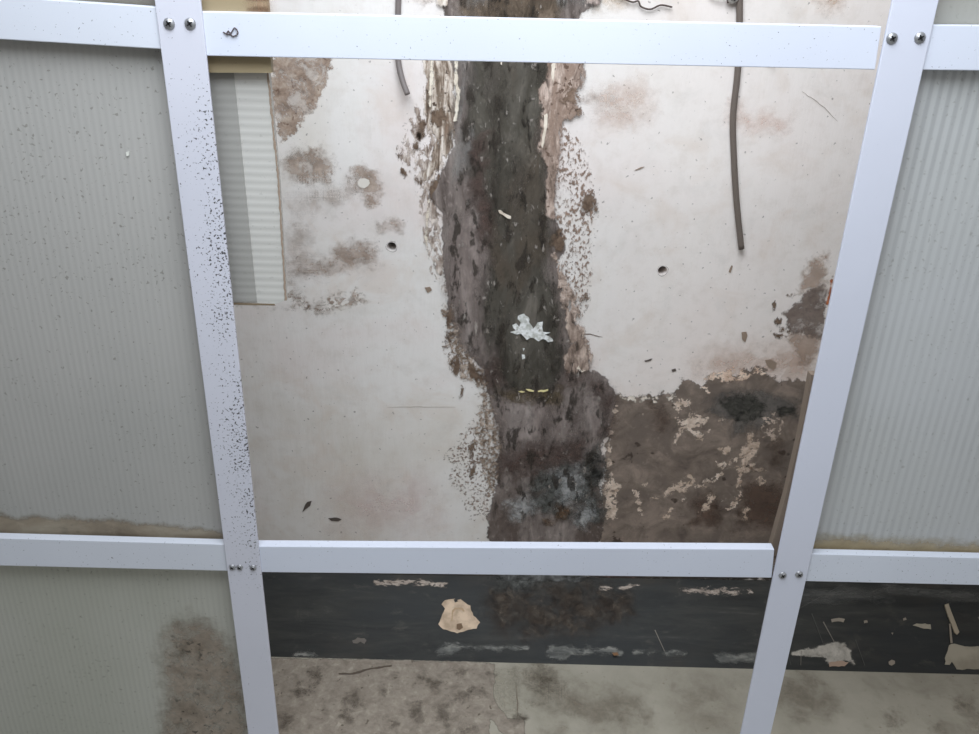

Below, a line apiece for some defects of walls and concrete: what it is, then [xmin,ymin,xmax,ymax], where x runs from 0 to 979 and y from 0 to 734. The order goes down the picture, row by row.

spalling [436,0,601,19]
leakage [271,57,333,141]
leakage [286,149,332,184]
leakage [350,166,380,206]
leakage [297,243,373,274]
spalling [396,60,806,543]
peeling [439,599,480,633]
peeling [945,644,979,670]
leakage [164,622,247,734]